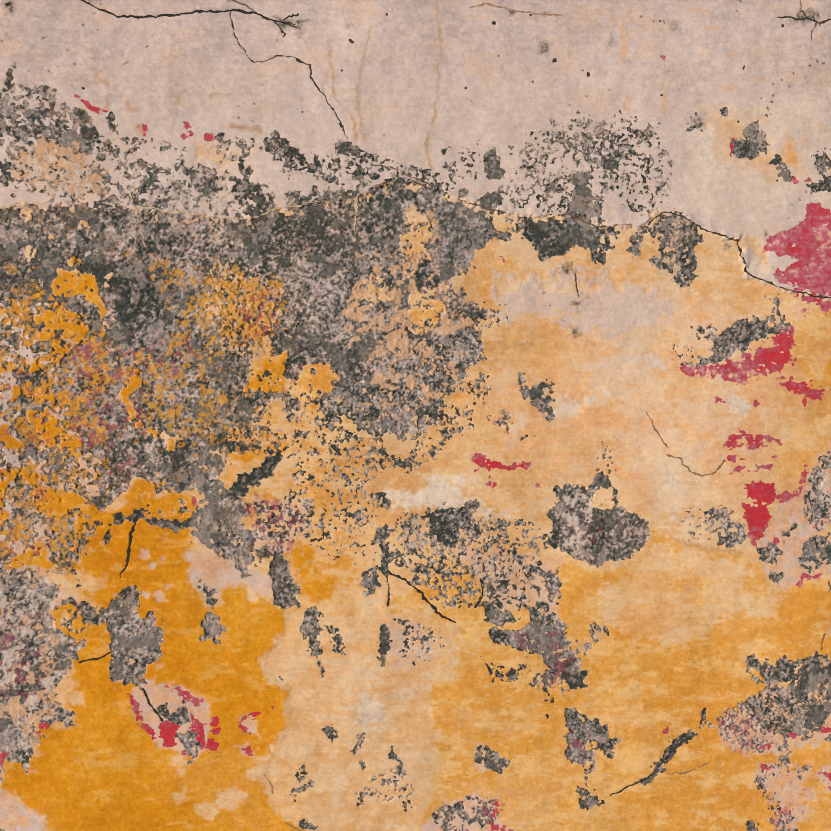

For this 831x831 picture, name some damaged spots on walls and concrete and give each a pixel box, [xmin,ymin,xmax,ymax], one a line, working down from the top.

crack [81,0,348,139]
crack [777,0,831,39]
crack [353,163,433,233]
crack [562,211,831,299]
peeling [763,202,831,317]
peeling [671,294,831,407]
spalling [0,62,704,812]
peeling [682,428,831,588]
crack [386,571,456,623]
crack [610,709,710,796]
spalling [634,651,831,831]
spalling [432,794,514,831]